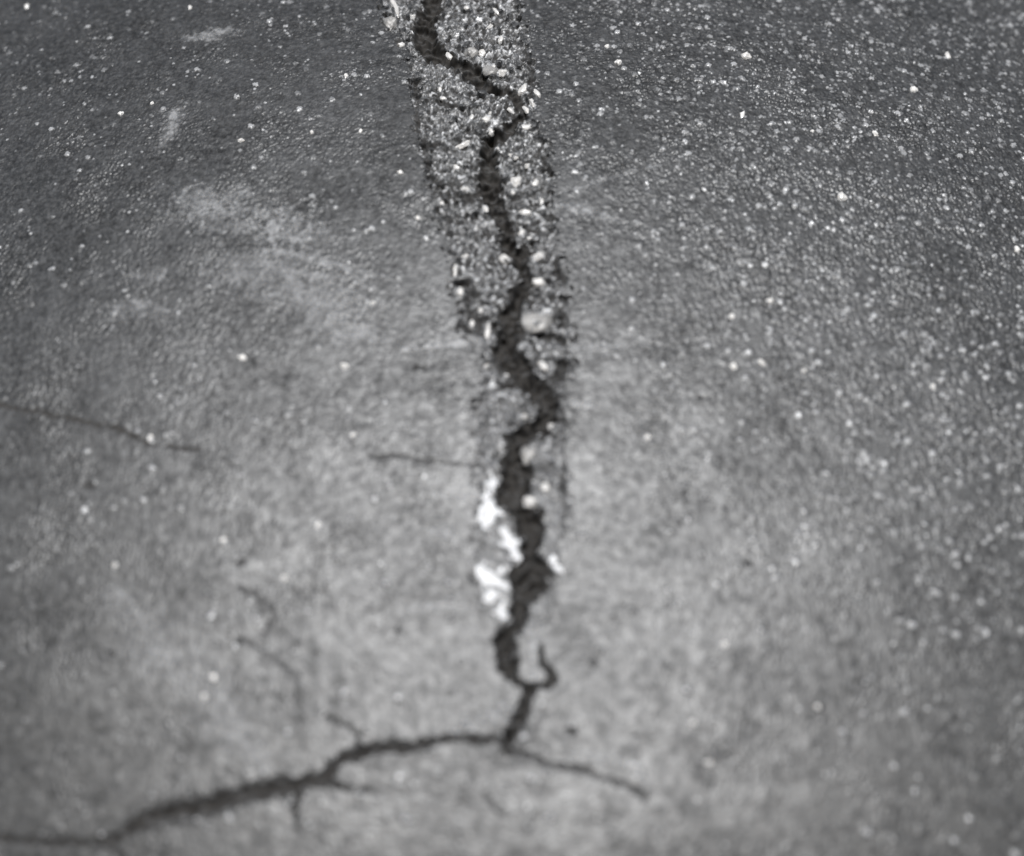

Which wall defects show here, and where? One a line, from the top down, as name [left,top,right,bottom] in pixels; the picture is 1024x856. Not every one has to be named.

crack [0,0,649,856]
spalling [375,0,580,637]